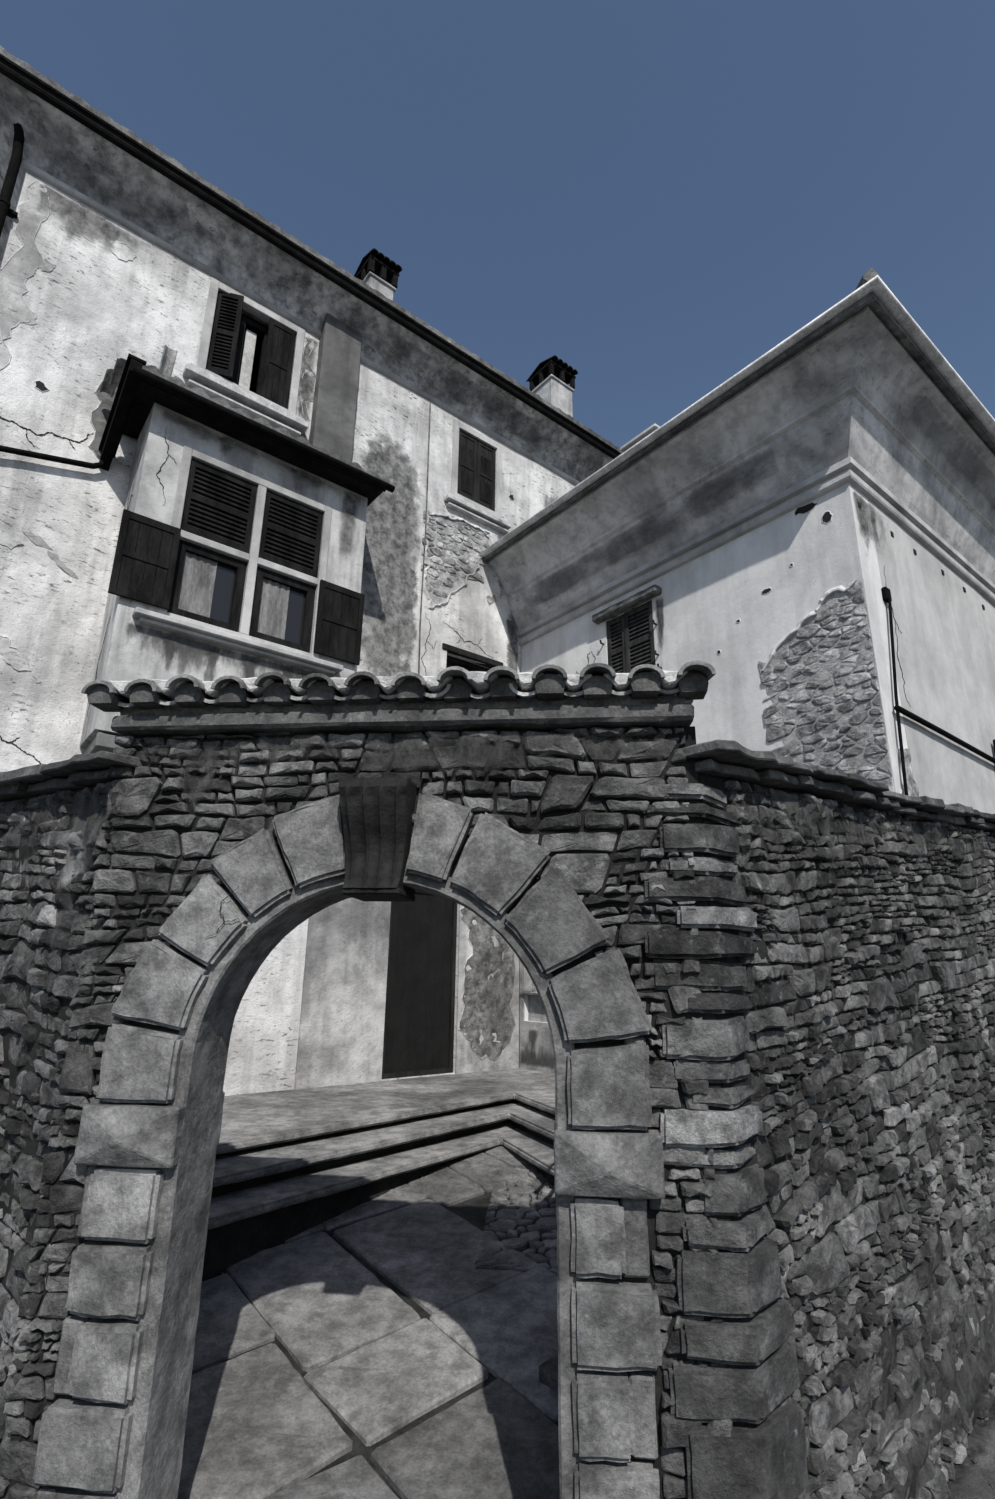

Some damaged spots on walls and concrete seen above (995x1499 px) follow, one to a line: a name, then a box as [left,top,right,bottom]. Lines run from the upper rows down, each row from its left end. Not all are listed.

crack [0,416,94,449]
leakage [341,493,357,550]
flaking render [361,434,506,677]
leakage [127,623,316,681]
flaking render [758,580,919,797]
crack [0,736,41,764]